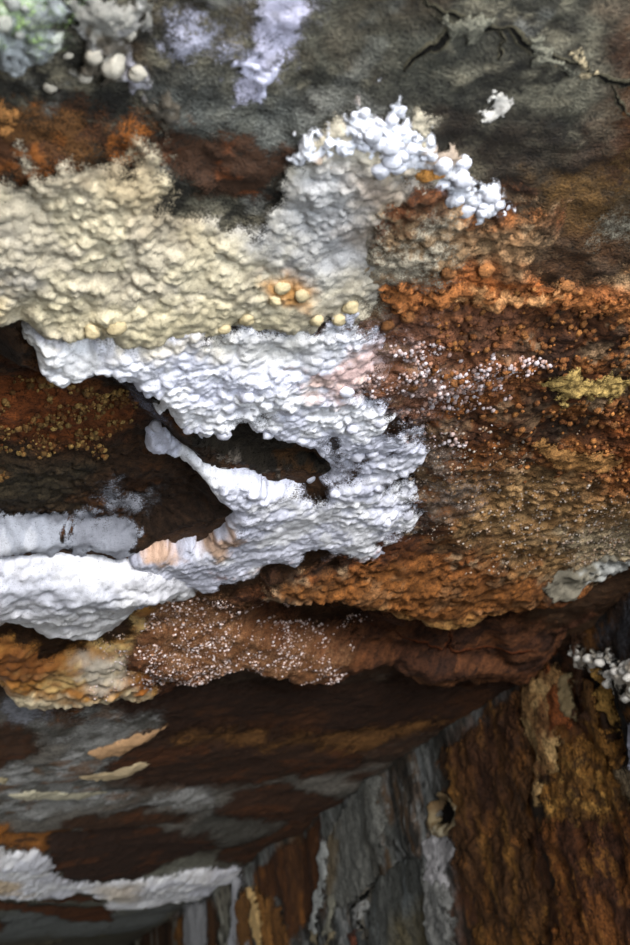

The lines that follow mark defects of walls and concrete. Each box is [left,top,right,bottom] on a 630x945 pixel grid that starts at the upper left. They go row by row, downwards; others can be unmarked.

rust [0,96,299,201]
leakage [0,0,319,132]
leakage [480,90,514,123]
crack [403,0,630,117]
leakage [0,95,516,849]
rust [48,182,630,945]
rust [0,721,47,775]
leakage [567,592,630,803]
rust [0,894,115,923]
rust [0,805,220,883]
leakage [0,845,249,945]
leakage [421,835,459,945]